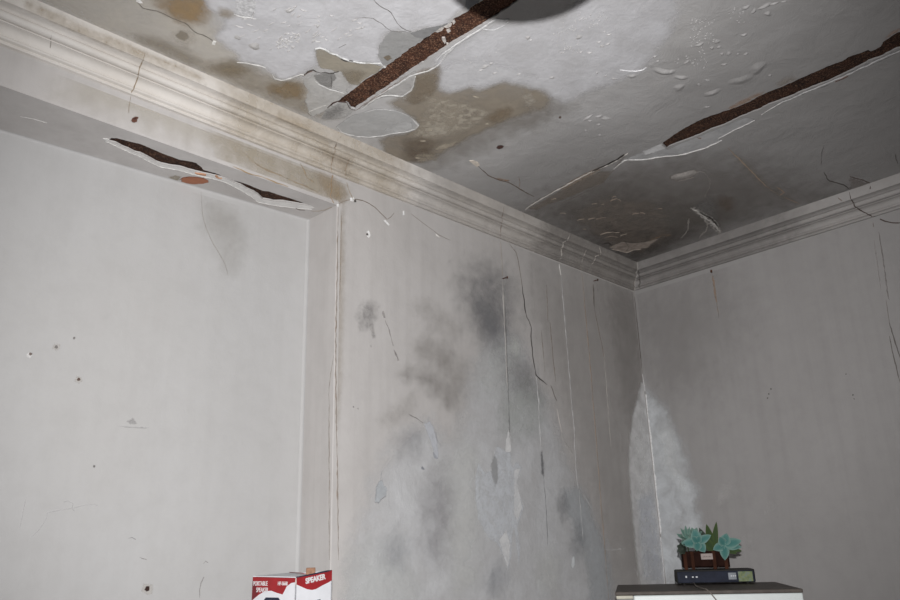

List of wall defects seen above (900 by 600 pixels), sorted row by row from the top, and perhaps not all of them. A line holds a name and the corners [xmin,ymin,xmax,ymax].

corrosion [110,138,221,184]
flaking render [103,138,315,211]
water stain [135,0,308,128]
corrosion [236,181,302,203]
flaking render [237,19,510,161]
water stain [374,68,549,161]
flaking render [614,50,900,169]
crack [821,147,900,227]
crack [469,153,629,431]
crack [886,302,900,381]
water stain [349,332,610,600]
water stain [629,374,707,584]